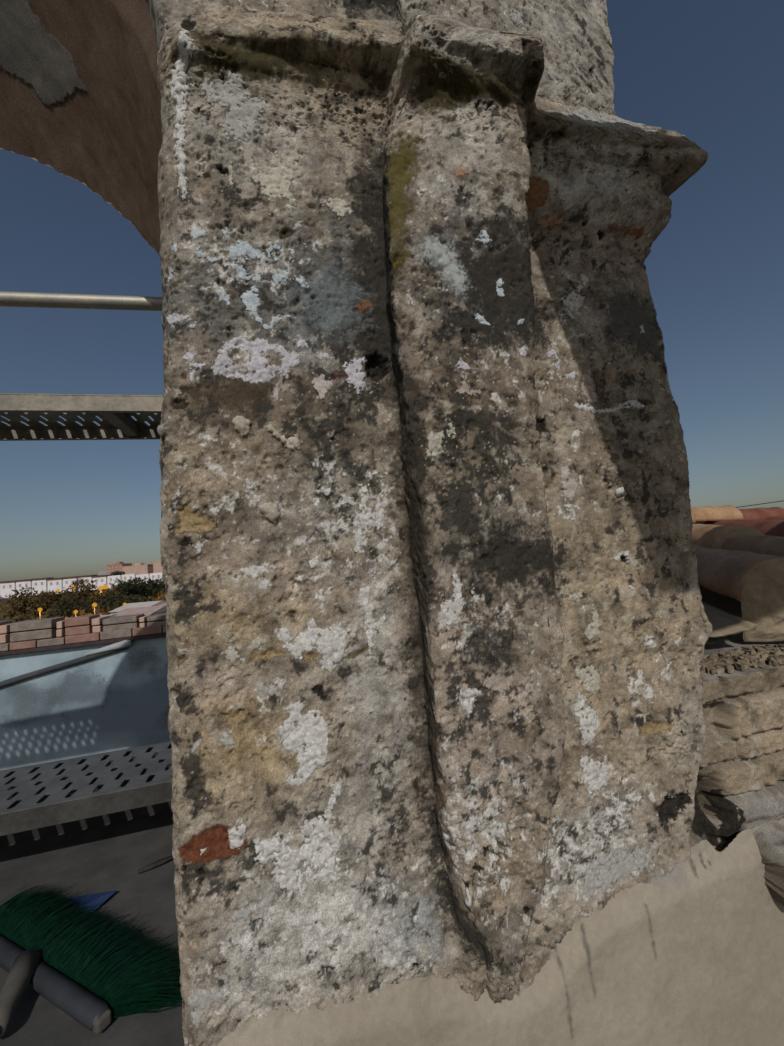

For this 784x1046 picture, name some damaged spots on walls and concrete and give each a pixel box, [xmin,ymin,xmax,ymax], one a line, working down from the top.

peeling [0,0,88,107]
peeling [178,783,345,925]